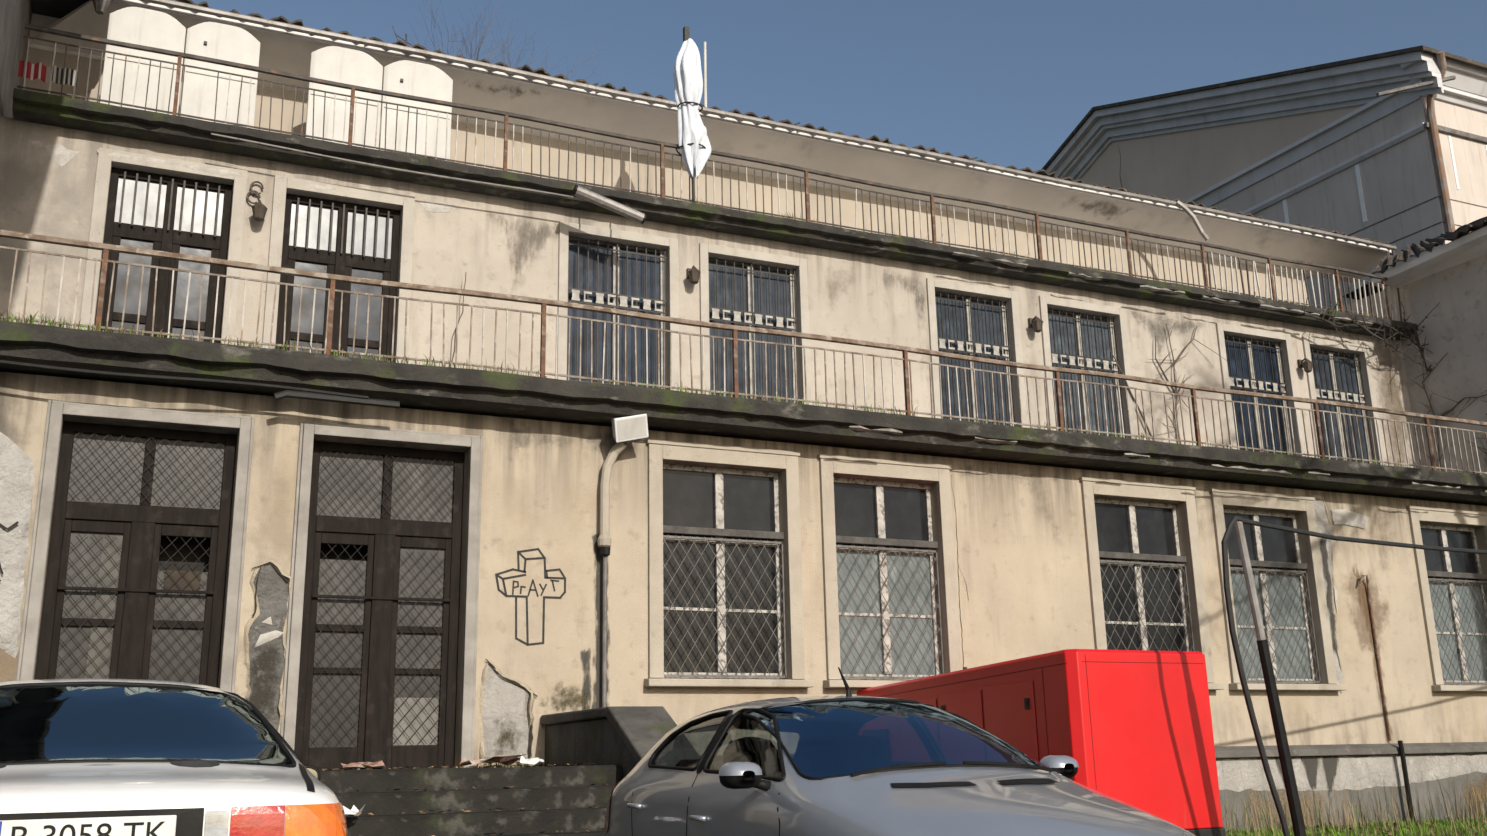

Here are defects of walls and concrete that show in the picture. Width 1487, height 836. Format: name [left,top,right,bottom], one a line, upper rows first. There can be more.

spalling [1210,464,1330,477]
spalling [1412,482,1460,490]
peeling [243,560,292,734]
peeling [1310,495,1369,694]
rust [1357,573,1379,681]
peeling [479,660,534,763]
peeling [1216,754,1487,792]